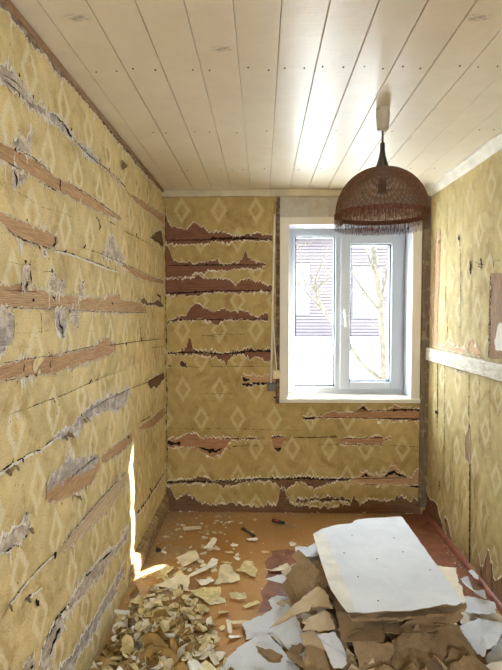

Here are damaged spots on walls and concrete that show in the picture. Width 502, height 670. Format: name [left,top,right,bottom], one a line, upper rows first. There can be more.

peeling [401,514,490,600]